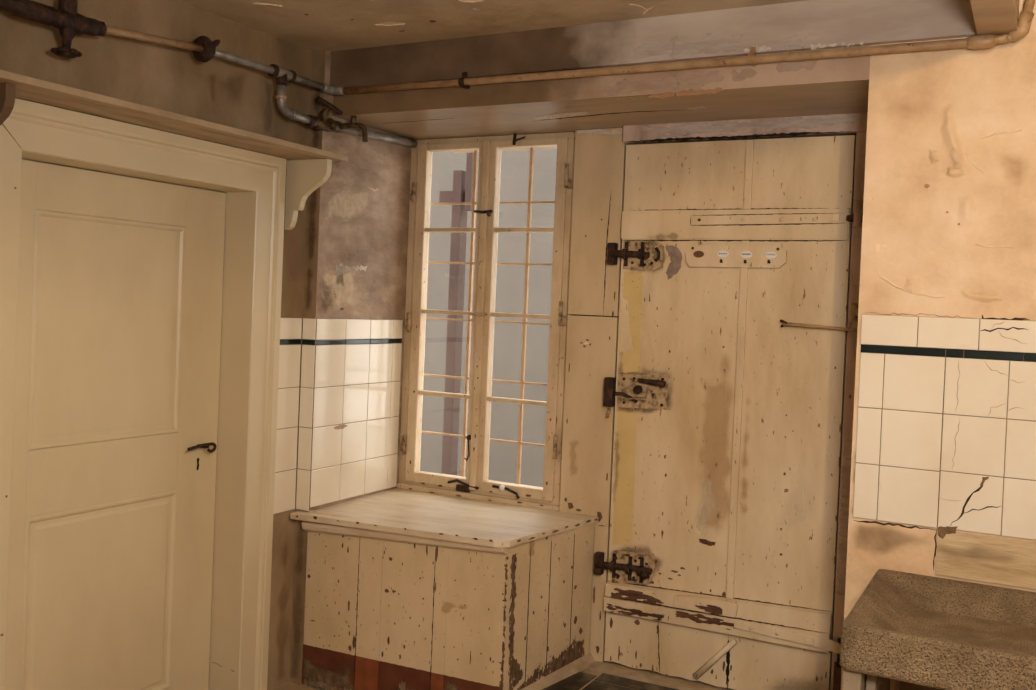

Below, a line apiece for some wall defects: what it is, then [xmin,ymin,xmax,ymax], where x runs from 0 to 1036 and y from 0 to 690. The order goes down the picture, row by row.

crack [867,274,1029,344]
crack [854,477,1000,571]
flaking render [938,526,958,539]